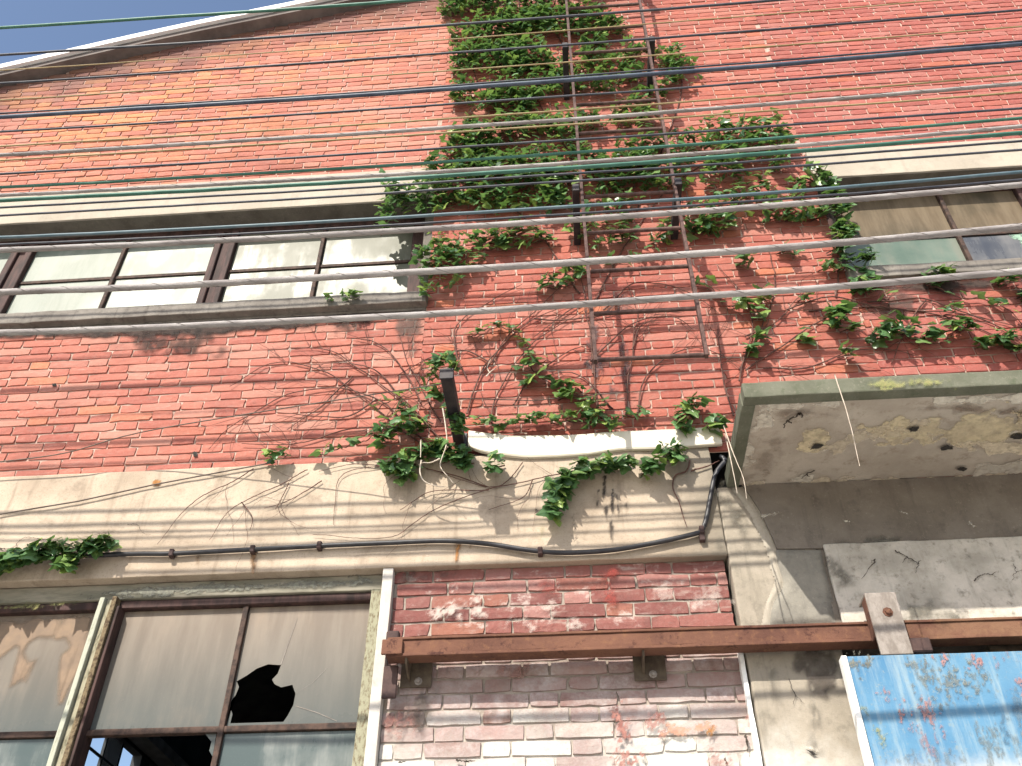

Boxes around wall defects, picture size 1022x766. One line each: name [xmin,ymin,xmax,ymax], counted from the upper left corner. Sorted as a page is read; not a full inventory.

damp [0,323,315,354]
damp [396,318,418,336]
peeling [750,403,807,430]
peeling [797,393,1022,477]
peeling [743,443,756,467]
damp [596,475,627,537]
damp [794,651,837,697]
peeling [610,700,645,766]
peeling [644,712,715,737]